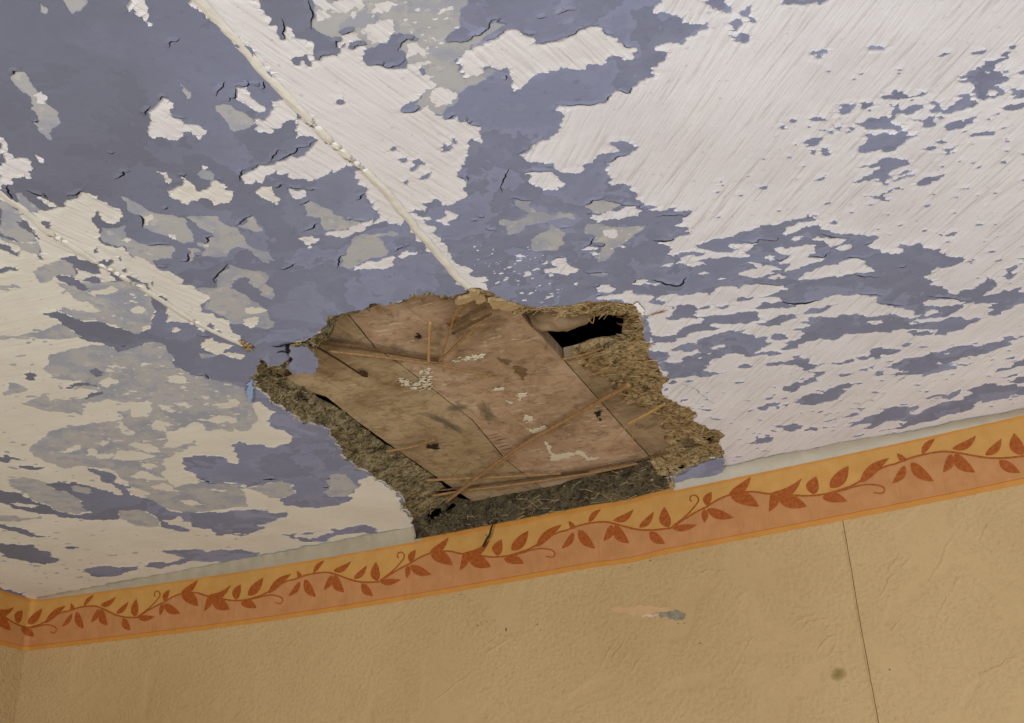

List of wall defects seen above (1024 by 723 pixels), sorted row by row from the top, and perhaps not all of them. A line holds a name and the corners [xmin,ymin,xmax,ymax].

peeling [188,0,1024,479]
flaking render [659,610,686,620]